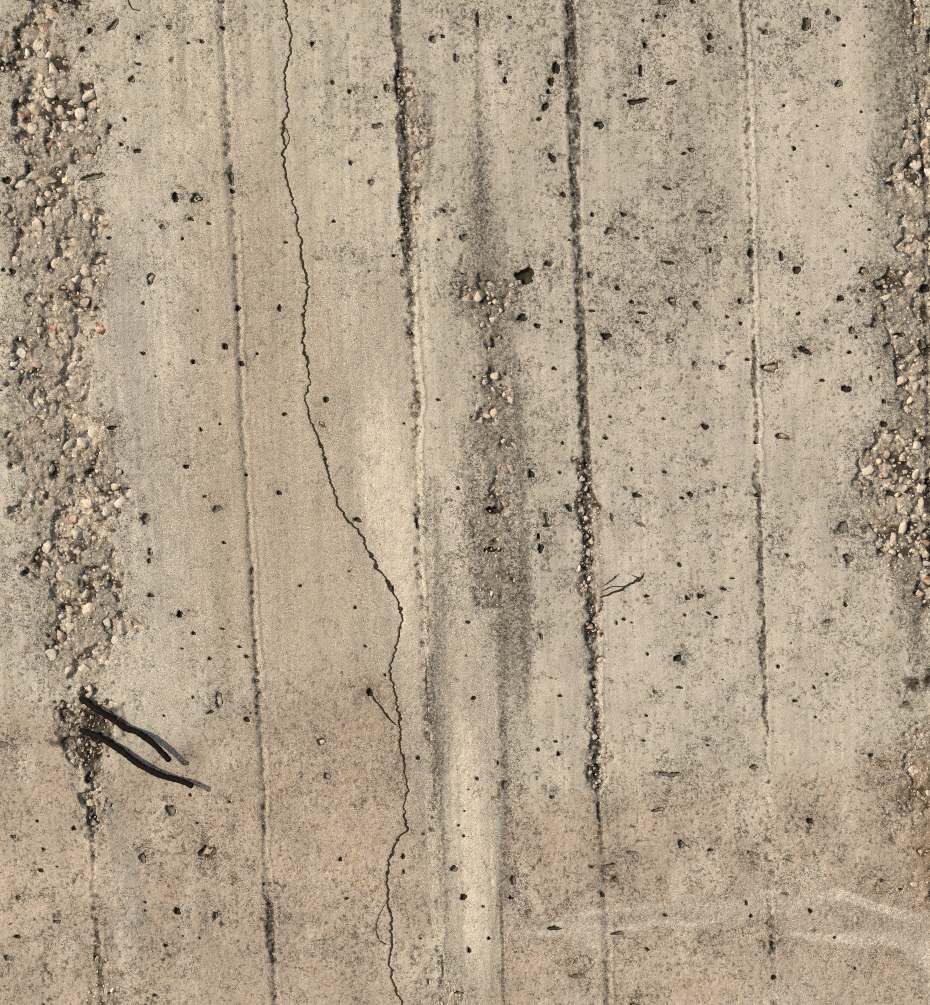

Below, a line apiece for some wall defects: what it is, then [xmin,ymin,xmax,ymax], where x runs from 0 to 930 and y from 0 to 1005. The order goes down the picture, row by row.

spalling [0,0,144,854]
crack [281,0,409,1005]
spalling [849,0,930,618]